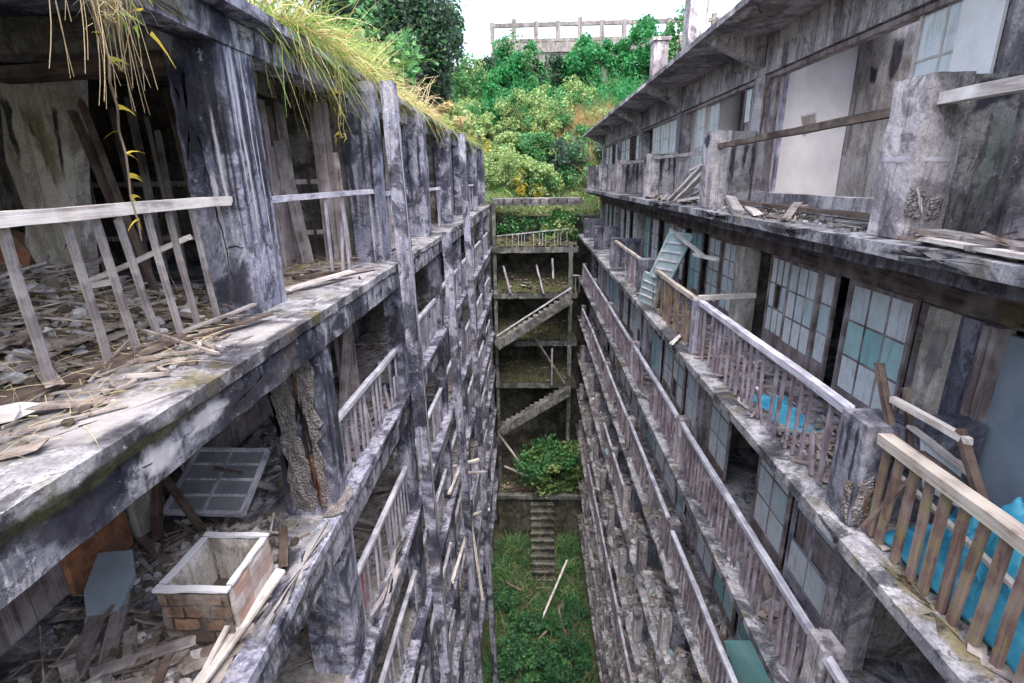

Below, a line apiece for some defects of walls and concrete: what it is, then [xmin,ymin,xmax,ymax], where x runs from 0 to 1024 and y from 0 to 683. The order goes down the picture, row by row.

spalling [905,103,1019,233]
crack [195,127,244,281]
leakage [36,391,180,447]
leakage [140,443,179,476]
spalling [270,361,354,517]
leakage [34,484,113,544]
spalling [840,476,876,526]